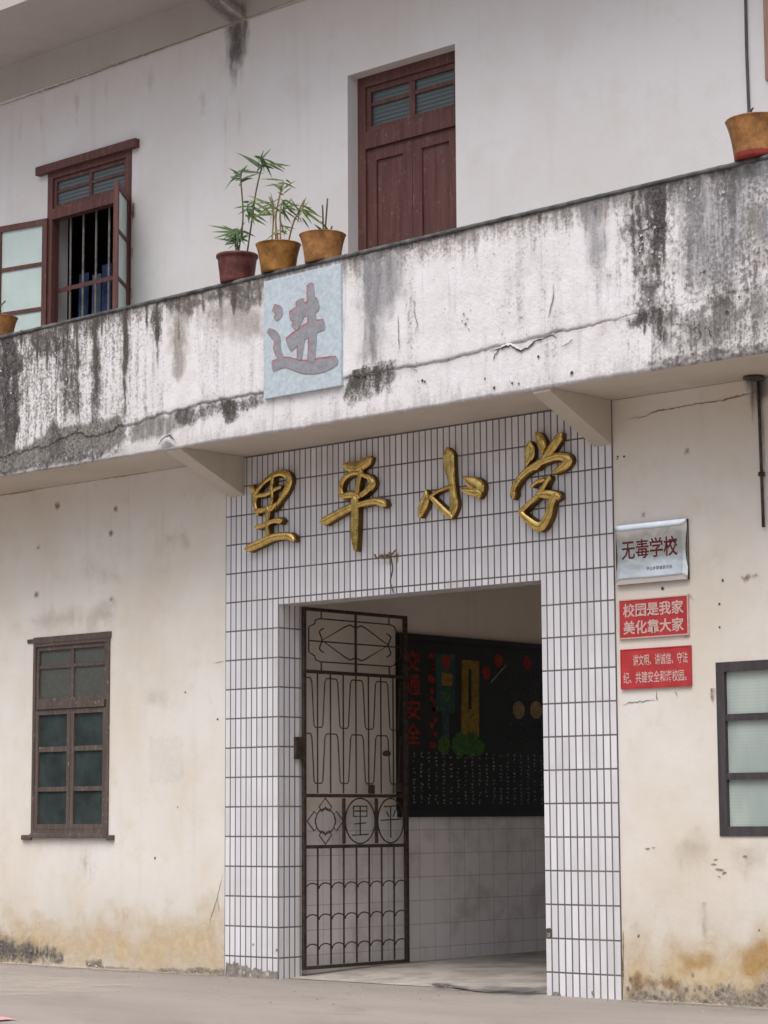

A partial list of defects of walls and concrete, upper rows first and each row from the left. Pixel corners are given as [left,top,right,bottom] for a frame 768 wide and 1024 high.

leakage [205,0,246,59]
leakage [620,160,767,366]
leakage [145,278,269,362]
crack [348,290,641,396]
leakage [0,309,263,475]
leakage [344,360,395,404]
crack [630,390,763,419]
leakage [0,924,218,969]
leakage [628,942,768,1007]